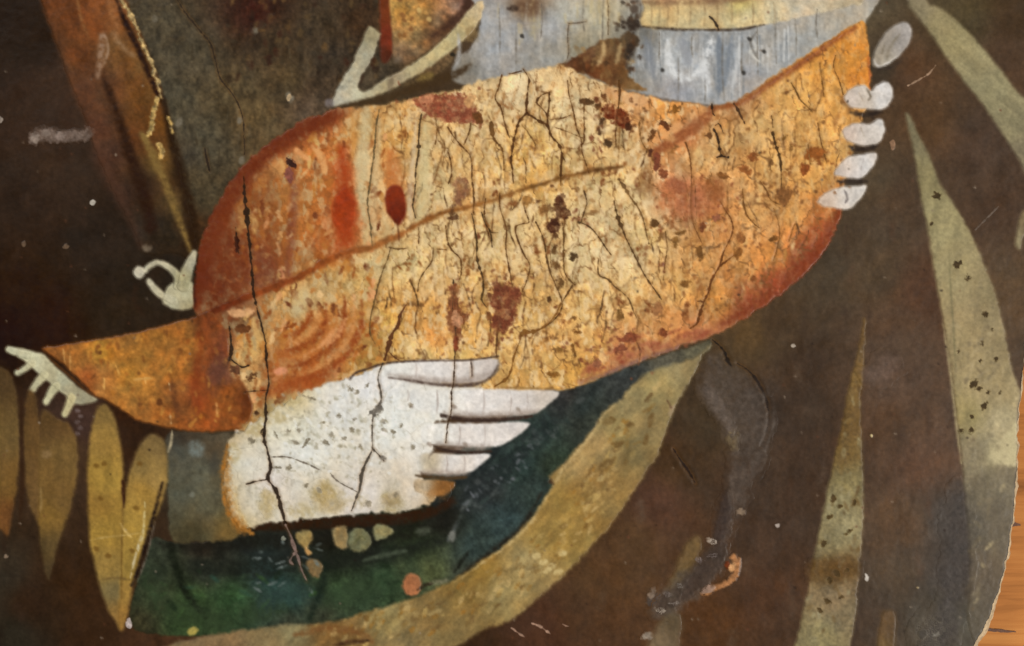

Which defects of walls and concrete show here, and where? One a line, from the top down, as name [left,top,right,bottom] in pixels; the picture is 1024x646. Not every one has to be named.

crack [177,0,668,581]
crack [684,102,745,185]
crack [689,115,796,428]
crack [790,55,844,165]